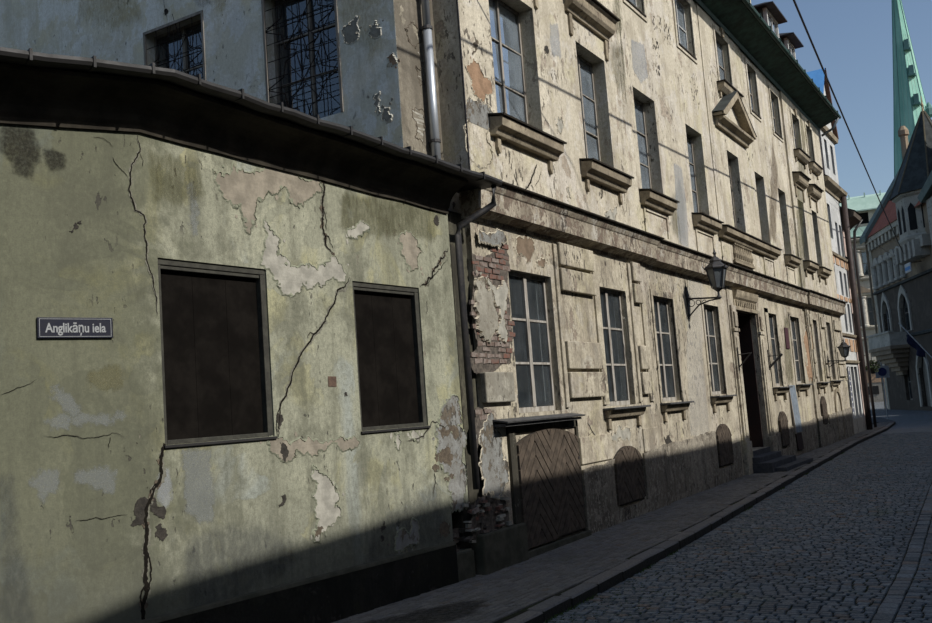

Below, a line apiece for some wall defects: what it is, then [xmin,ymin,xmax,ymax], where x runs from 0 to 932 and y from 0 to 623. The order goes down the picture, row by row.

mould [2,125,64,176]
crack [95,135,159,315]
peeling [212,162,349,298]
crack [276,277,350,439]
crack [319,181,335,256]
crack [420,250,448,287]
peeling [463,39,494,170]
flaking render [469,225,550,374]
crack [139,443,167,620]
peeling [260,413,360,544]
peeling [390,394,512,543]